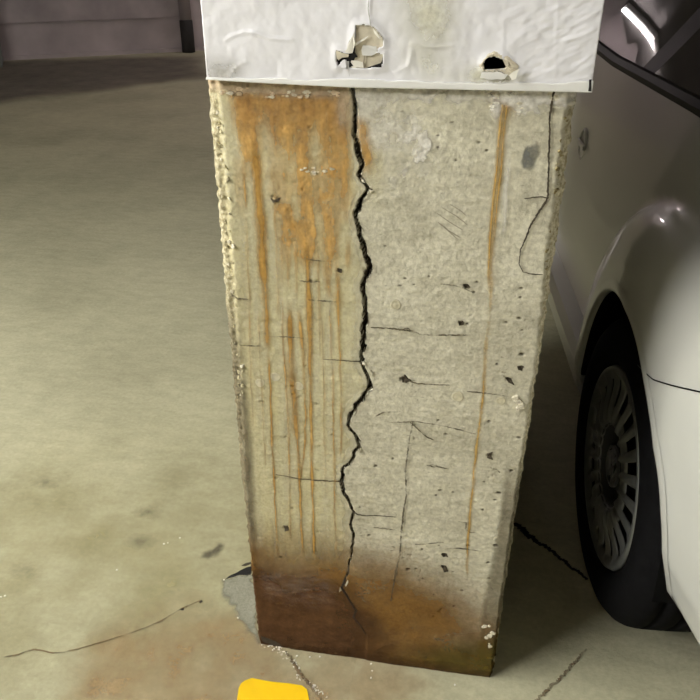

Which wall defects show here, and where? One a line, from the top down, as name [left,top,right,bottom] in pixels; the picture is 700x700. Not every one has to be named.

peeling [336,25,383,68]
corrosion [488,101,508,270]
crack [519,92,555,275]
corrosion [231,91,499,678]
crack [276,88,478,635]
crack [514,523,588,580]
crack [7,618,166,657]